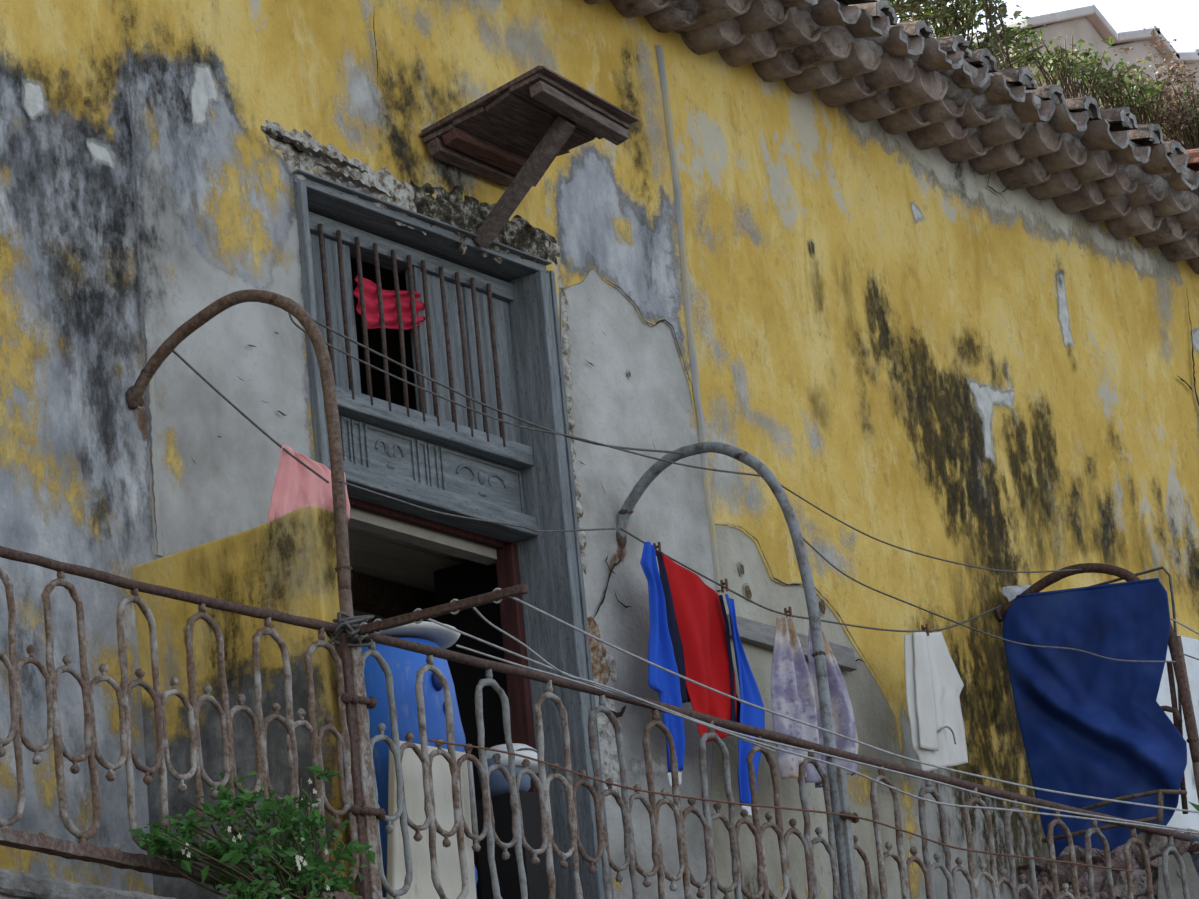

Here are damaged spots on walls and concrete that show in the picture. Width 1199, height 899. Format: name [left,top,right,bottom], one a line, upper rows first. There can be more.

damp [192,42,232,98]
damp [45,117,157,361]
peeling [0,46,694,885]
peeling [704,363,791,509]
peeling [967,379,1015,462]
peeling [838,104,1183,317]
peeling [1056,270,1074,347]
crack [1176,289,1199,406]
damp [208,518,295,693]
damp [857,280,1059,890]
damp [1160,519,1199,590]
peeling [8,847,244,899]